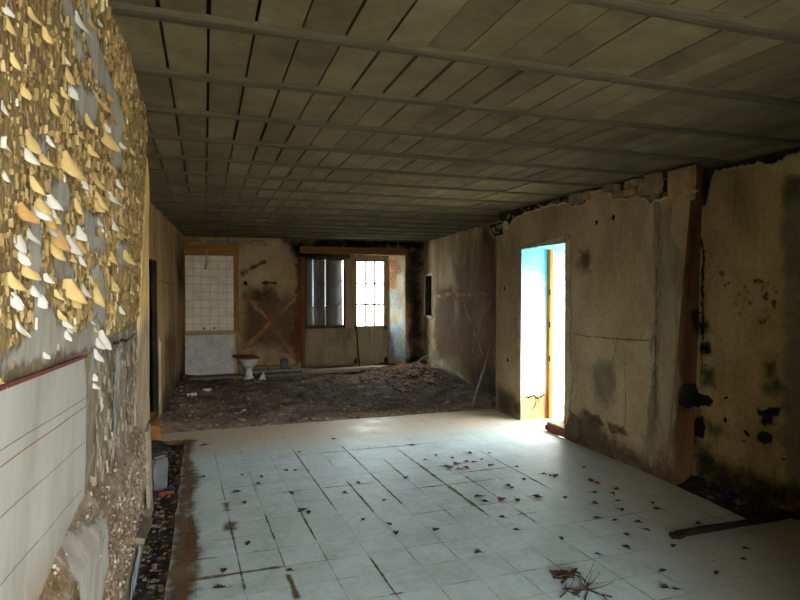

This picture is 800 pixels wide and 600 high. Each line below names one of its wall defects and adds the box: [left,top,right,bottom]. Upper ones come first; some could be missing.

peeling [0,0,148,496]
corrosion [243,261,301,364]
crack [571,333,651,426]
leakage [572,416,667,481]
flaking render [488,150,800,469]
crack [698,239,711,381]
leakage [692,178,800,517]
peeling [131,546,141,598]
leakage [163,440,280,600]